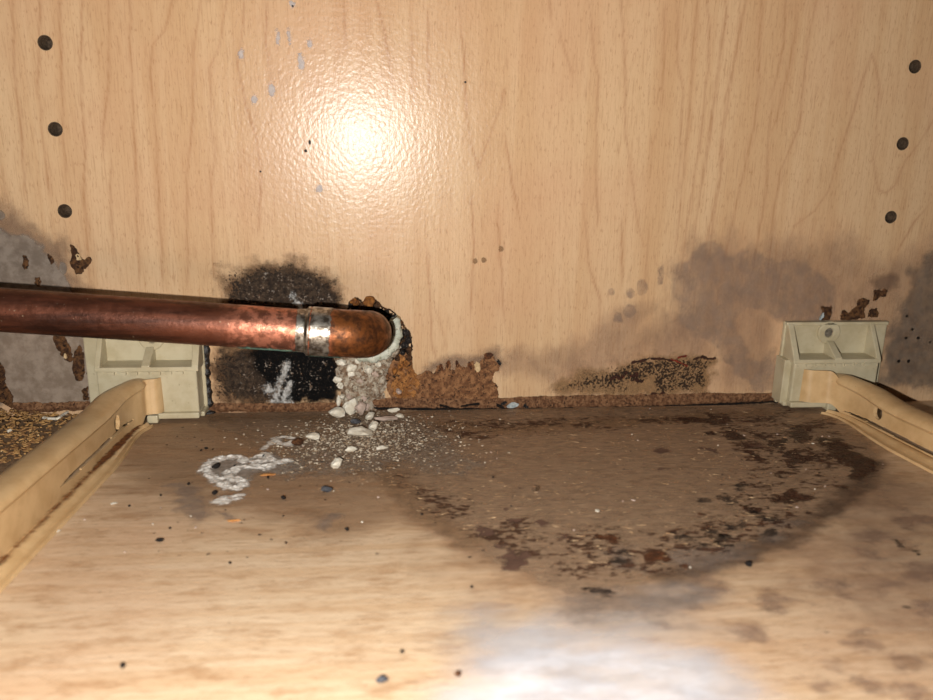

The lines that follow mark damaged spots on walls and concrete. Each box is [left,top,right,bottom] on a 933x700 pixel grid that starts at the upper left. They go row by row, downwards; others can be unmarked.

water stain [0,211,77,293]
peeling [70,245,92,274]
water stain [222,264,341,309]
peeling [819,288,888,320]
water stain [0,332,90,404]
peeling [53,336,90,400]
peeling [347,296,502,400]
water stain [204,345,884,612]
water stain [458,629,743,700]